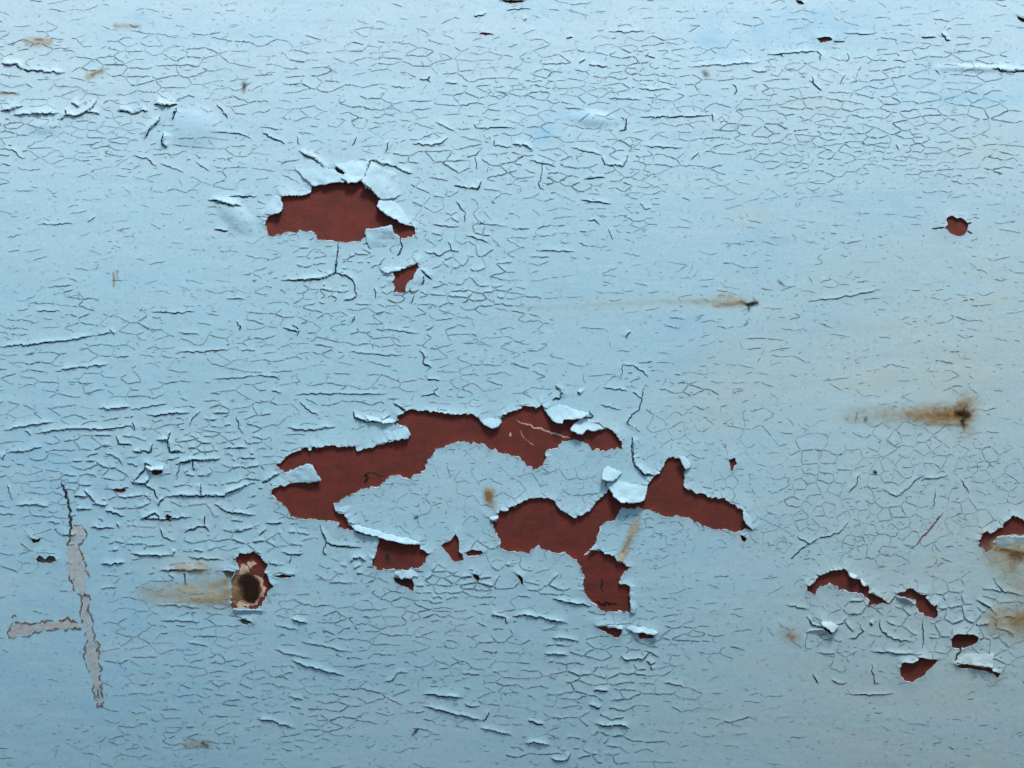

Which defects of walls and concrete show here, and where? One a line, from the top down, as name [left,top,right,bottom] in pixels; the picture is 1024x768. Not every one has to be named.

crack [508,0,604,20]
peeling [264,160,416,250]
crack [767,275,916,331]
crack [913,239,1024,393]
corrosion [885,398,973,426]
corrosion [155,561,267,608]
peeling [270,404,623,593]
crack [373,442,607,545]
peeling [486,455,754,639]
peeling [807,568,938,619]
crack [723,338,1024,730]
peeling [900,657,939,683]